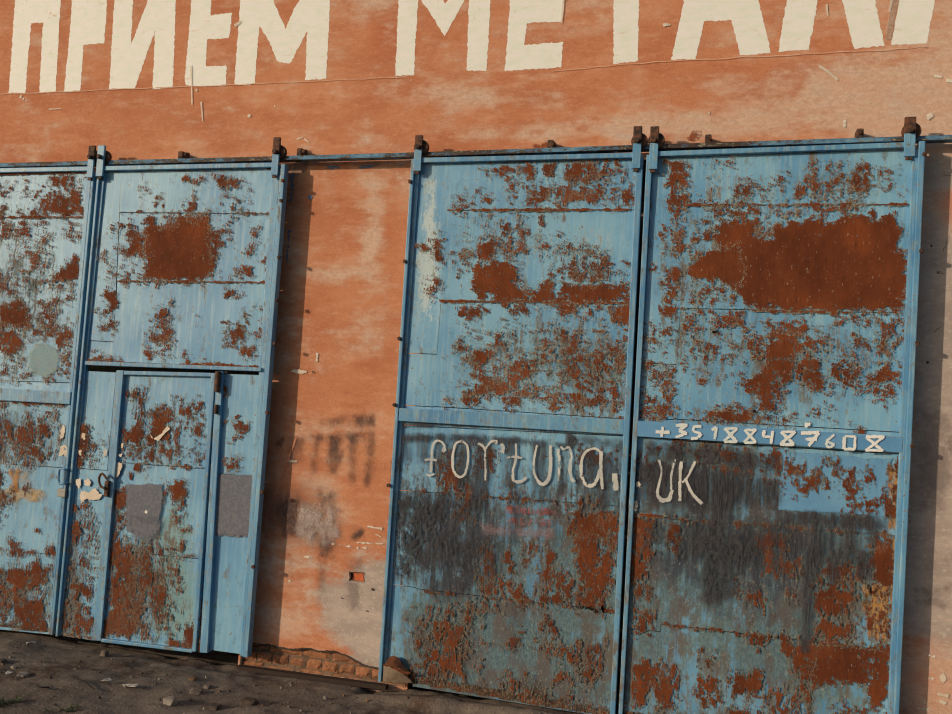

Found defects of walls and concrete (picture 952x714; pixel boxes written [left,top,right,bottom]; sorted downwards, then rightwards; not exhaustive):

corrosion [0,172,87,386]
corrosion [87,168,271,403]
corrosion [414,152,635,420]
corrosion [639,150,910,434]
peeling [76,478,102,503]
corrosion [0,384,251,652]
spalling [240,642,409,688]
corrosion [402,433,619,714]
corrosion [623,437,898,714]